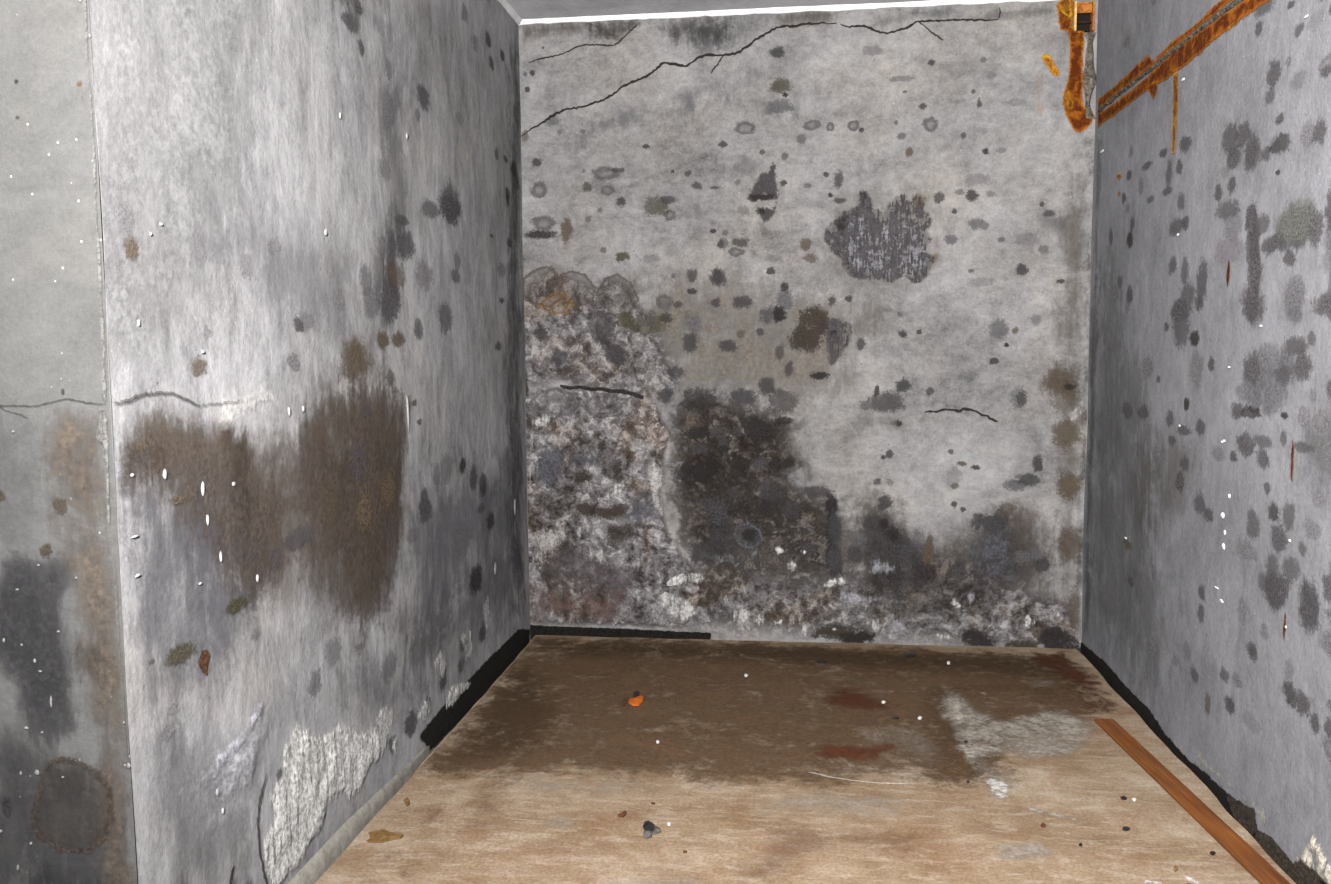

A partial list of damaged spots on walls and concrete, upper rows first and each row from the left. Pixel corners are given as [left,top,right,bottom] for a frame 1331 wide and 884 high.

leakage [671,16,727,42]
crack [522,7,1001,136]
leakage [769,47,785,58]
rust [1042,0,1271,153]
crack [114,391,200,406]
leakage [126,215,432,678]
peeling [525,369,702,629]
leakage [257,66,1306,884]
leakage [1212,56,1331,653]
leakage [0,415,121,739]
leakage [1283,681,1331,761]
leakage [0,745,133,884]